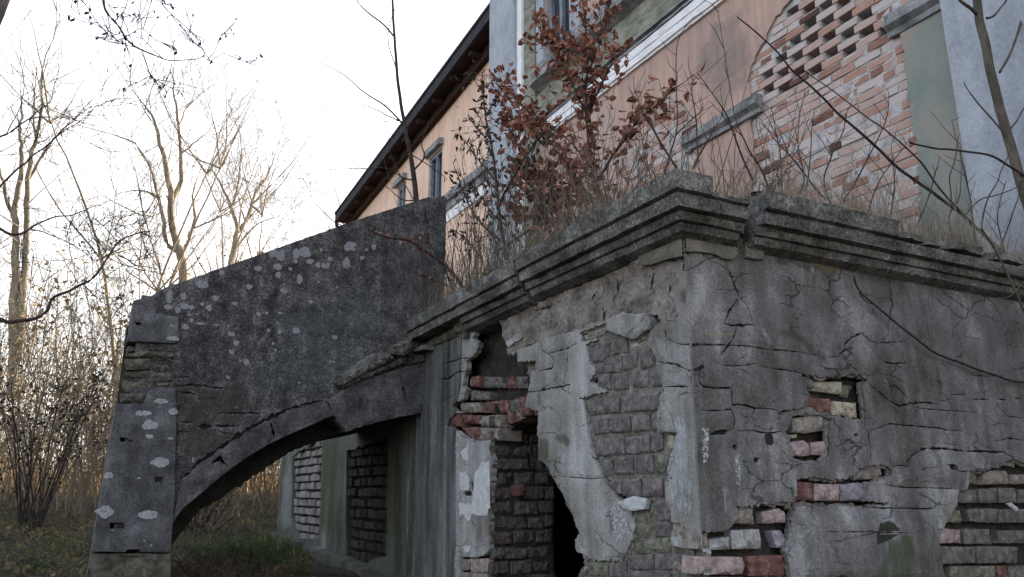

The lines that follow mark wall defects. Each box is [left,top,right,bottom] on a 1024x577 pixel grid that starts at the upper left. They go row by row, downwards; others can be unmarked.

flaking render [749,0,922,231]
spalling [117,346,175,404]
crack [177,376,322,479]
peeling [451,363,538,521]
crack [591,280,619,320]
crack [650,252,690,293]
spalling [500,258,890,577]
crack [661,273,795,436]
crack [826,333,1023,533]
spalling [461,545,498,577]
spalling [937,456,1024,577]